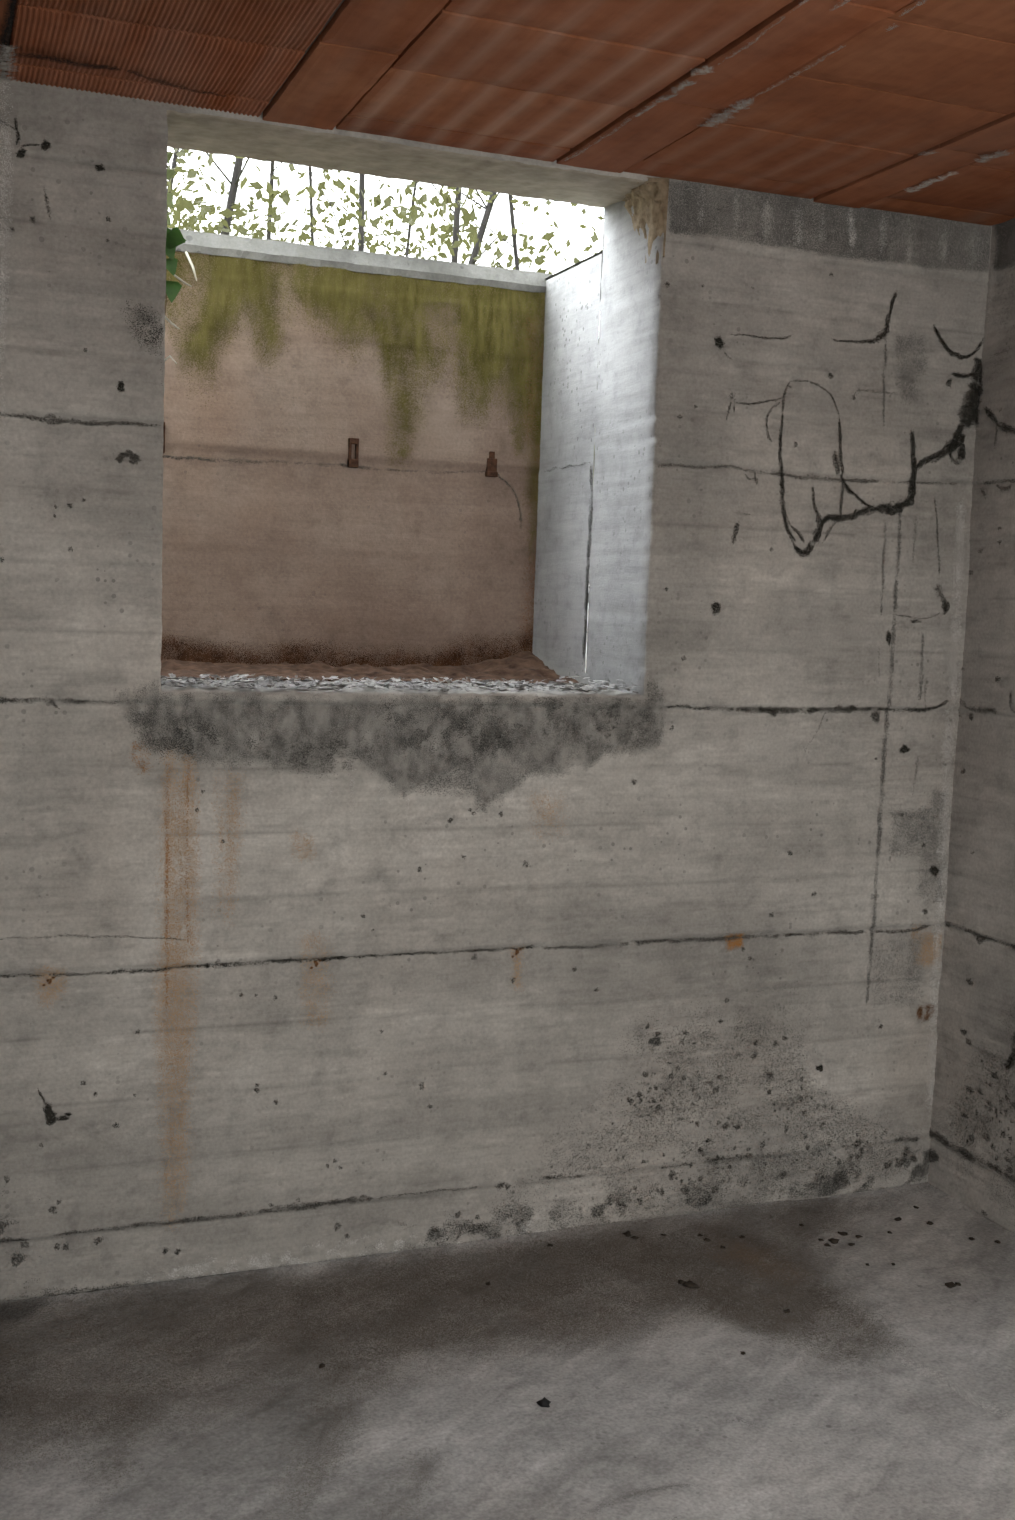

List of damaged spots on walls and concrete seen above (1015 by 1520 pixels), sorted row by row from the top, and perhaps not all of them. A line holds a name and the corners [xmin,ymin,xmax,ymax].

crack [0,0,231,97]
crack [833,291,897,344]
crack [661,325,1015,623]
leakage [0,500,1015,1520]